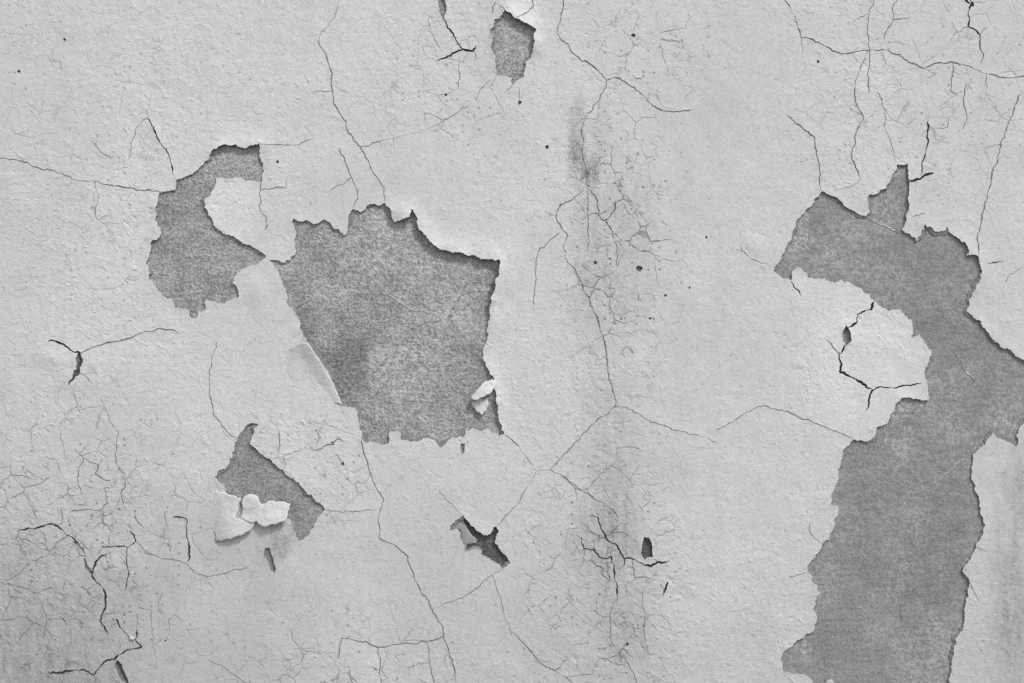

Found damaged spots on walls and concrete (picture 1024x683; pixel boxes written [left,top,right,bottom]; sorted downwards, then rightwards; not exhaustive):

crack [316,5,520,207]
peeling [490,10,536,84]
crack [785,0,1024,282]
crack [48,328,179,418]
crack [0,430,247,683]
peeling [210,423,325,542]
peeling [146,143,504,454]
peeling [450,516,510,568]
peeling [641,537,653,559]
crack [492,0,850,683]
crack [828,301,921,410]
peeling [774,164,1024,683]